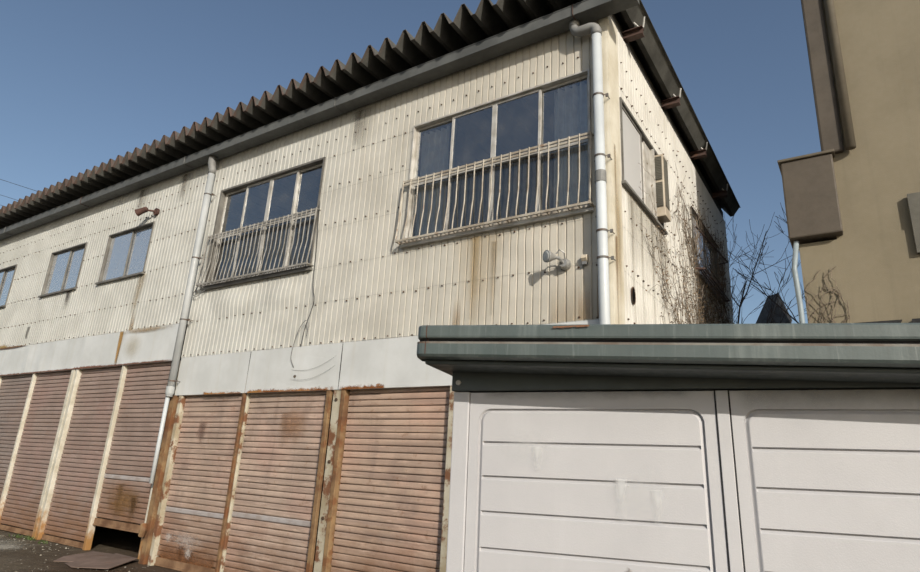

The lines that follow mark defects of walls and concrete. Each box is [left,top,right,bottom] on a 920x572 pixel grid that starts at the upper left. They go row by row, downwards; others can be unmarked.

rust [0,331,168,376]